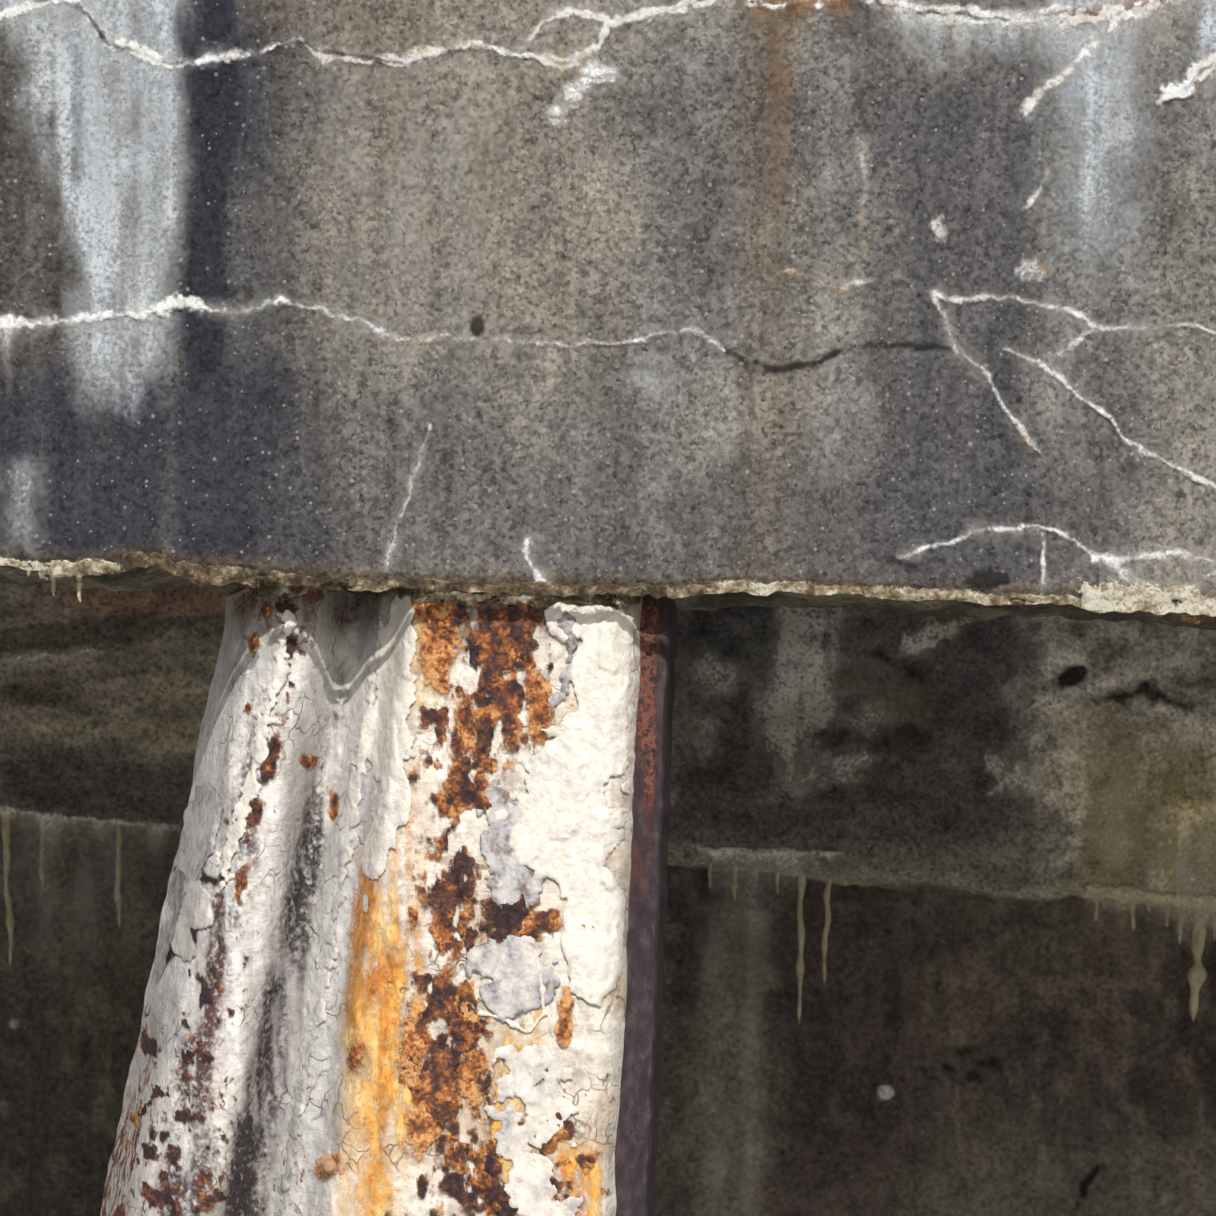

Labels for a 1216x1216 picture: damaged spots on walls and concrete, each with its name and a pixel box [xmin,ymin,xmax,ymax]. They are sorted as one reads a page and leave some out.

water stain [0,0,184,399]
water stain [549,60,617,125]
crack [0,0,1181,116]
water stain [1049,0,1137,248]
crack [1156,52,1216,104]
crack [0,290,1216,489]
crack [905,524,1214,591]
water stain [754,606,871,793]
rust [308,589,563,1216]
peeling [0,549,1216,1216]
rust [554,986,576,1047]
rust [528,1112,613,1216]